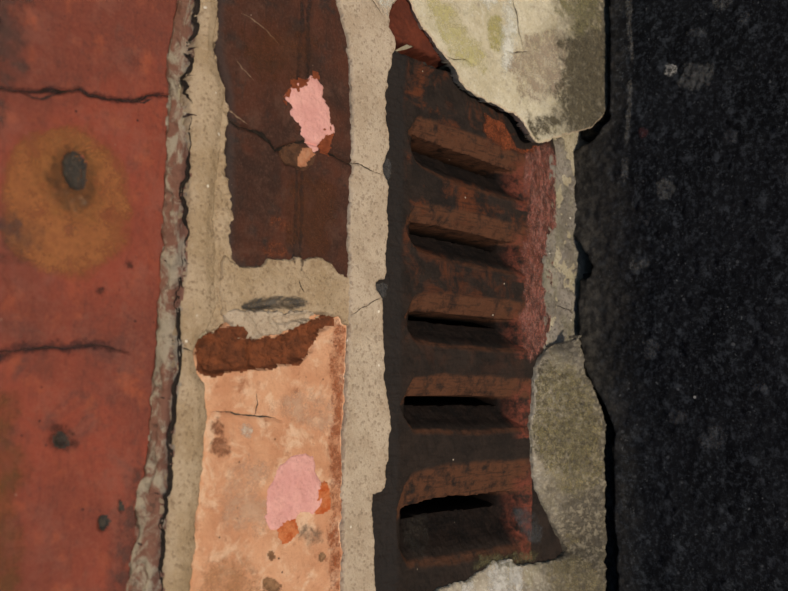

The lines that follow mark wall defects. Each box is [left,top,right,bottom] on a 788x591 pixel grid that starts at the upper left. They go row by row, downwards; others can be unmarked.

crack [3,88,168,104]
spalling [283,71,320,105]
crack [228,119,380,174]
spalling [279,126,334,171]
spalling [46,147,94,207]
rust [3,127,132,275]
spalling [126,0,200,591]
crack [0,344,129,356]
spalling [195,315,334,378]
spalling [49,425,77,449]
spalling [277,519,299,544]
spalling [263,577,282,591]